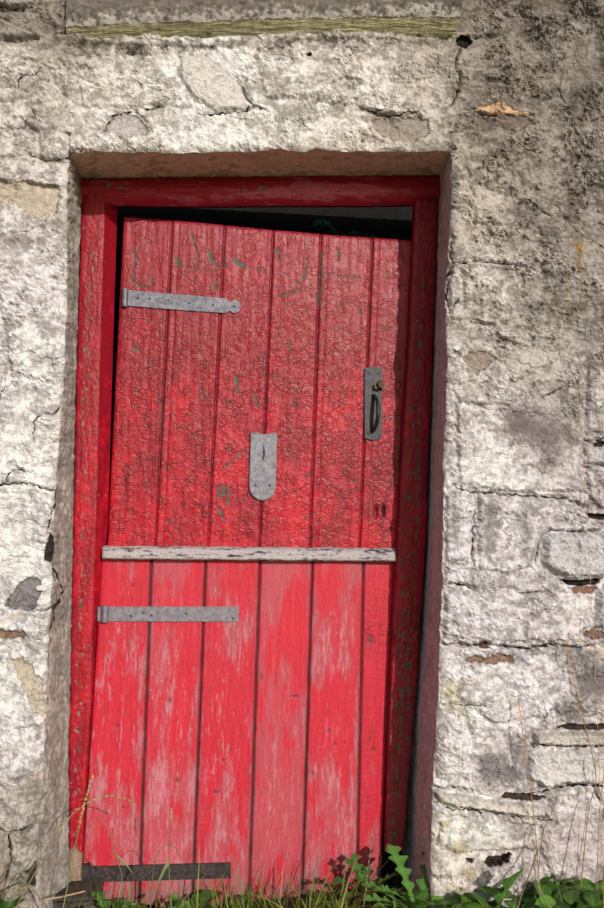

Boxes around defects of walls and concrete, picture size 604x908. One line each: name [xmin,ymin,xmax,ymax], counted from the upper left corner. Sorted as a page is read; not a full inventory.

crack [450,35,533,118]
spalling [475,101,534,130]
spalling [0,172,63,222]
spalling [4,576,47,612]
spalling [0,624,26,639]
spalling [464,641,514,665]
spalling [10,652,46,725]